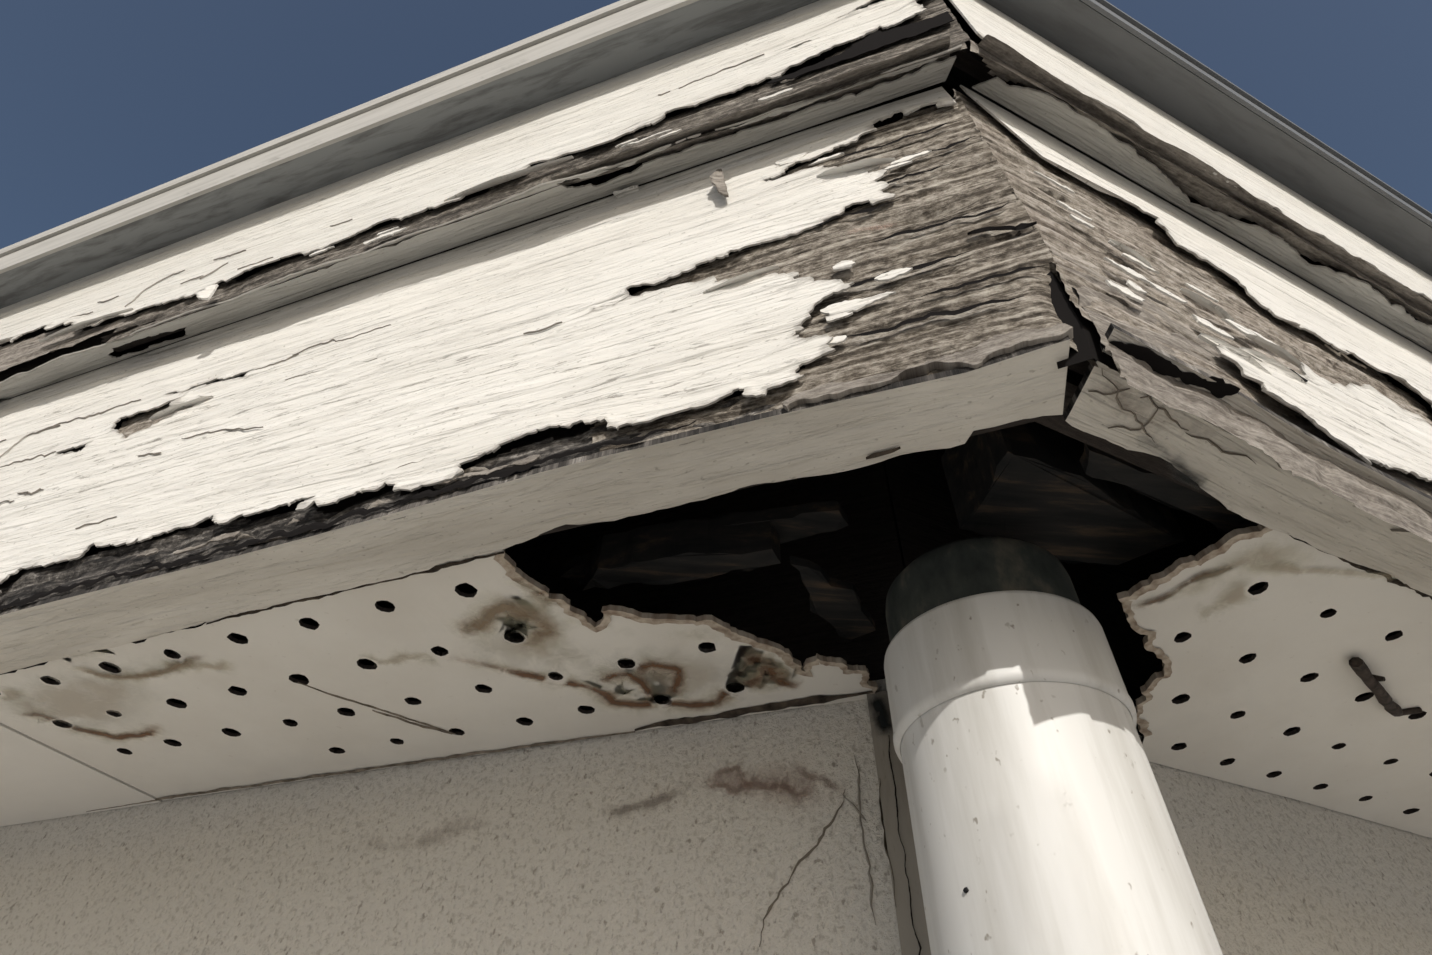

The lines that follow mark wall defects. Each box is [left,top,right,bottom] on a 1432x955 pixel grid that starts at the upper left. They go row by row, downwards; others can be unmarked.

peeling [0,0,1432,371]
peeling [588,89,1432,452]
crack [816,119,1256,464]
peeling [117,373,246,438]
damp [72,727,154,740]
damp [87,659,192,679]
crack [86,682,873,812]
damp [463,603,554,642]
damp [490,666,545,681]
damp [566,663,728,708]
spalling [1117,524,1272,737]
crack [759,737,922,955]